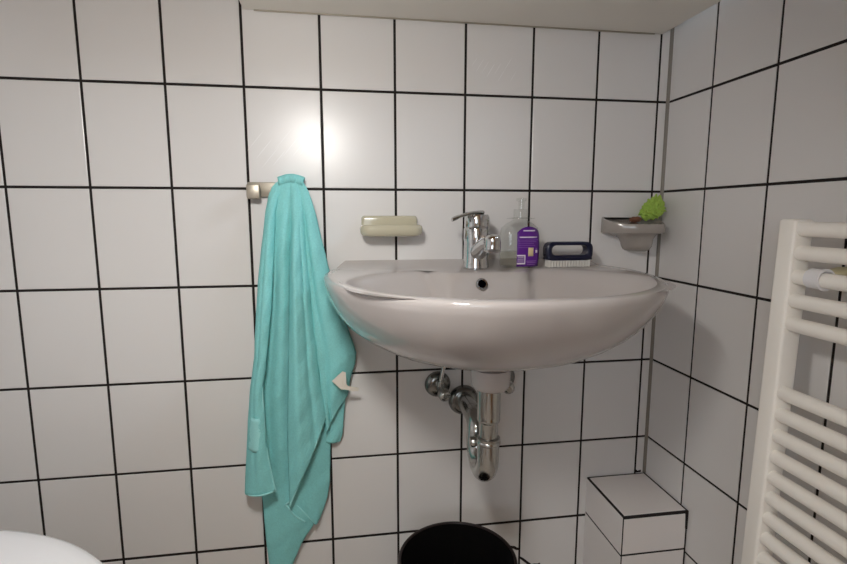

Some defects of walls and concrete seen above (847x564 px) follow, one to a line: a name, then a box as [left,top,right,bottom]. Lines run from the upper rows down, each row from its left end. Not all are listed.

crack [511,546,540,564]